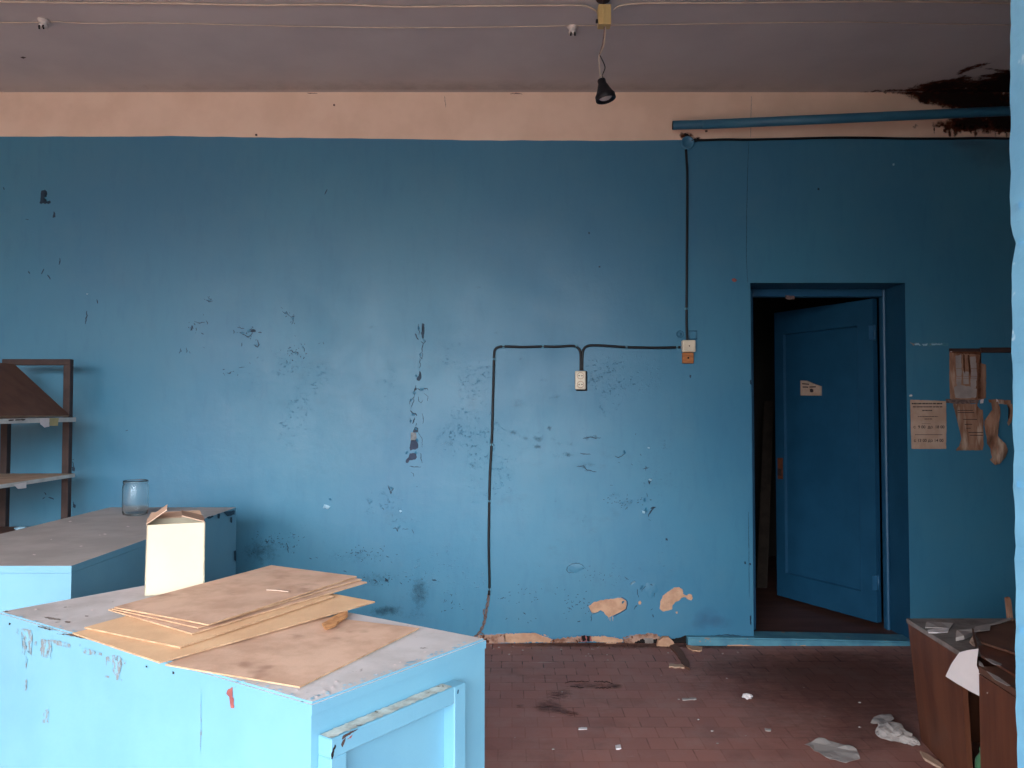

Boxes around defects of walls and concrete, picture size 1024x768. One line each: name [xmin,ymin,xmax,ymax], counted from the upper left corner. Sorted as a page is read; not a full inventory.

leakage [872,63,1011,137]
peeling [405,323,428,487]
spalling [478,573,693,644]